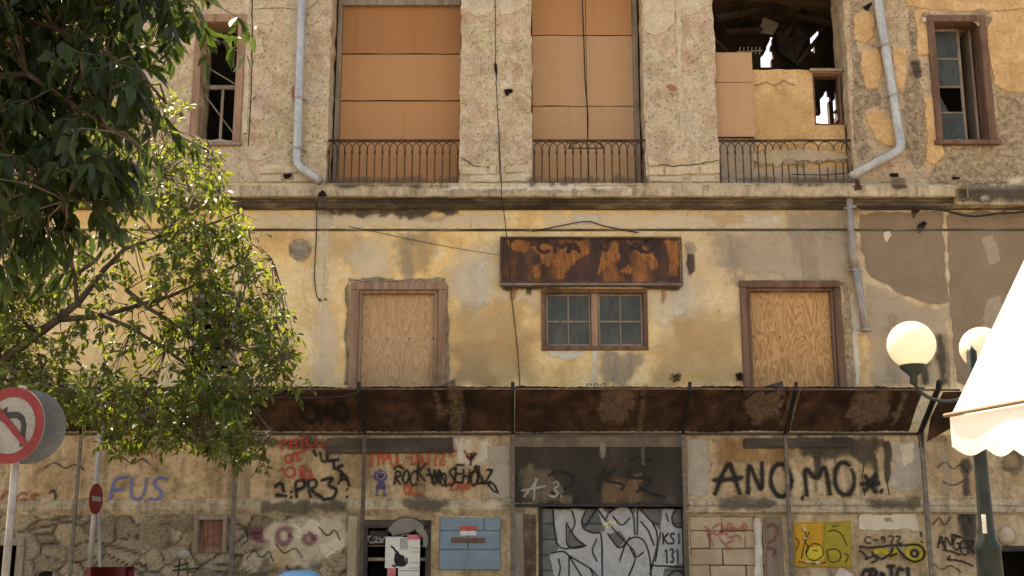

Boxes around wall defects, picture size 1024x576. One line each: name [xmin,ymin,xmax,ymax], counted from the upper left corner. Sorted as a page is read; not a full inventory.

spalling [751,0,1024,185]
damp [253,198,502,380]
damp [456,245,537,307]
damp [548,350,642,386]
corrosion [598,386,648,422]
corrosion [746,388,793,424]
corrosion [847,391,906,427]